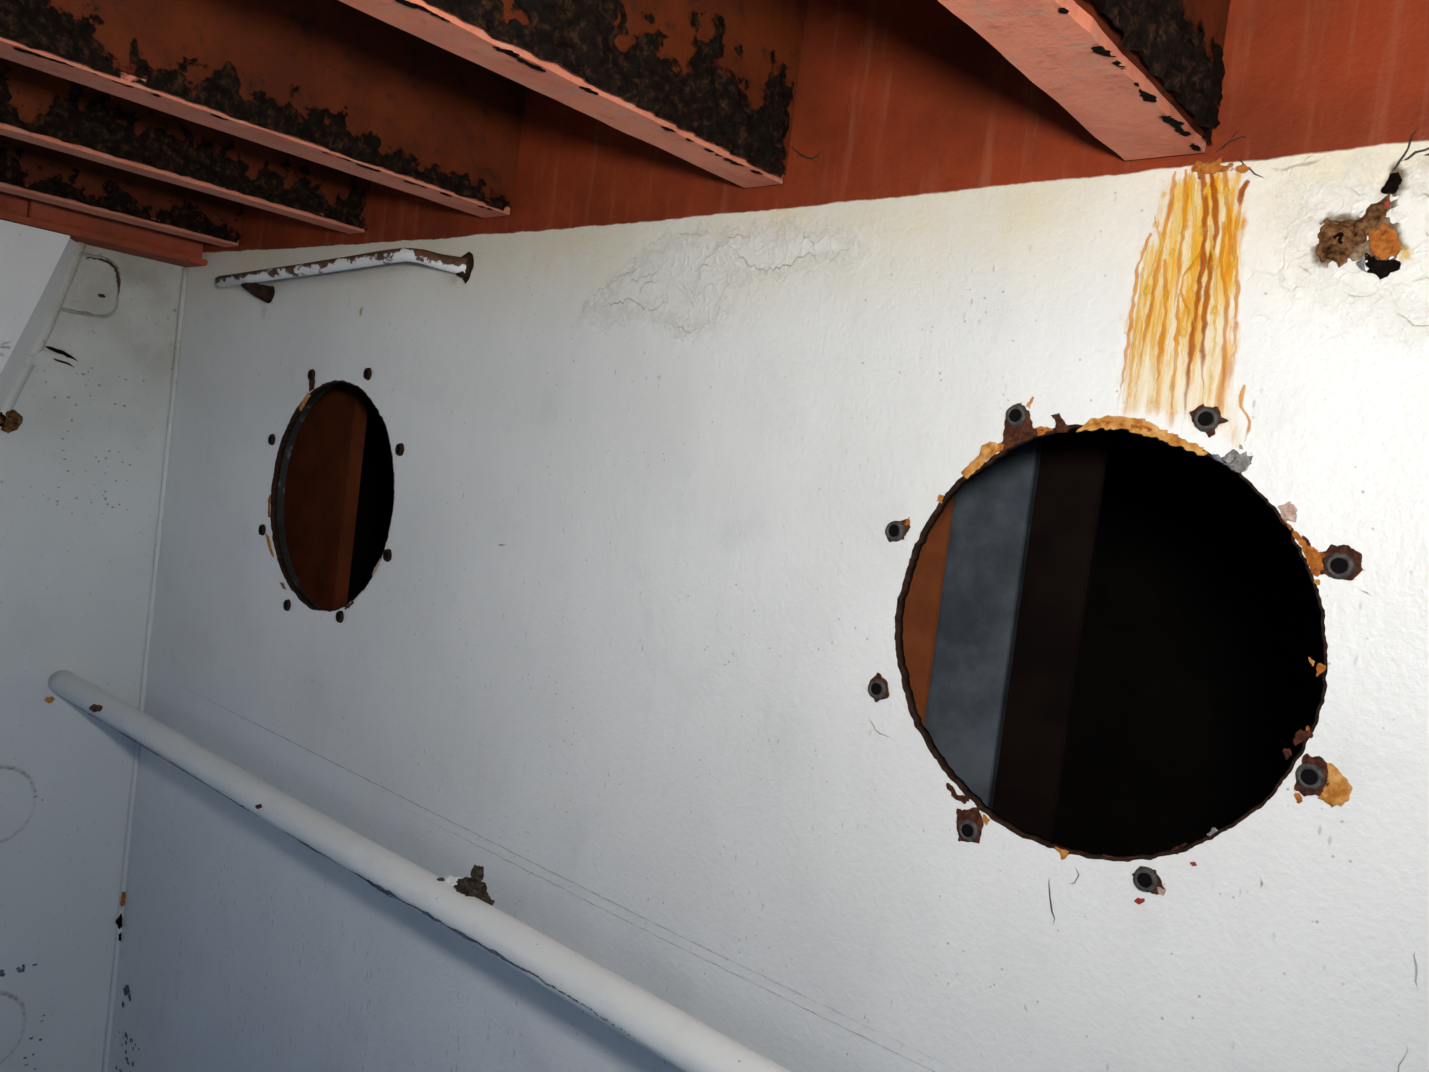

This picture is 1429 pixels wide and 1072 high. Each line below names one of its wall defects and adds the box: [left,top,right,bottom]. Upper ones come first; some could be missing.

corrosion [961,0,1251,479]
peeling [1313,166,1409,280]
corrosion [0,409,23,433]
corrosion [1282,726,1352,807]